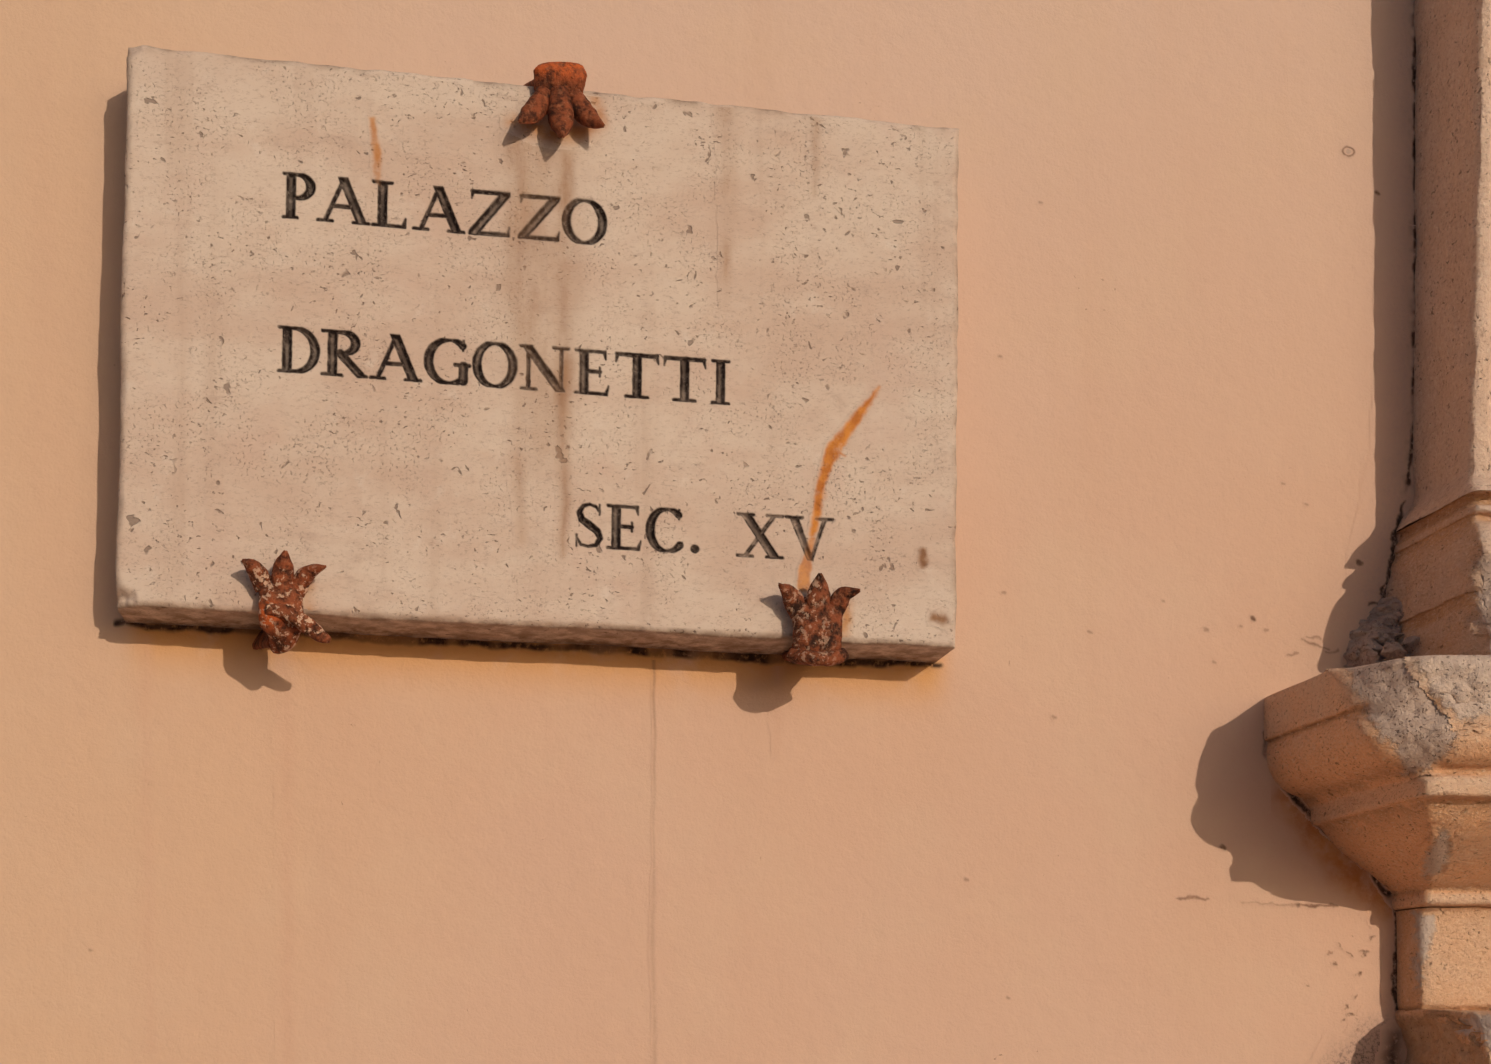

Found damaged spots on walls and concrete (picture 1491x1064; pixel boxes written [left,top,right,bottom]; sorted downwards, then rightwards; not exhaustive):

rust [366,114,385,189]
rust [499,96,613,150]
crack [1366,0,1417,608]
rust [795,383,883,595]
rust [303,576,320,611]
rust [834,586,859,638]
spalling [1286,596,1491,783]
crack [648,659,659,1064]
crack [1175,894,1340,910]
crack [1260,728,1400,1013]